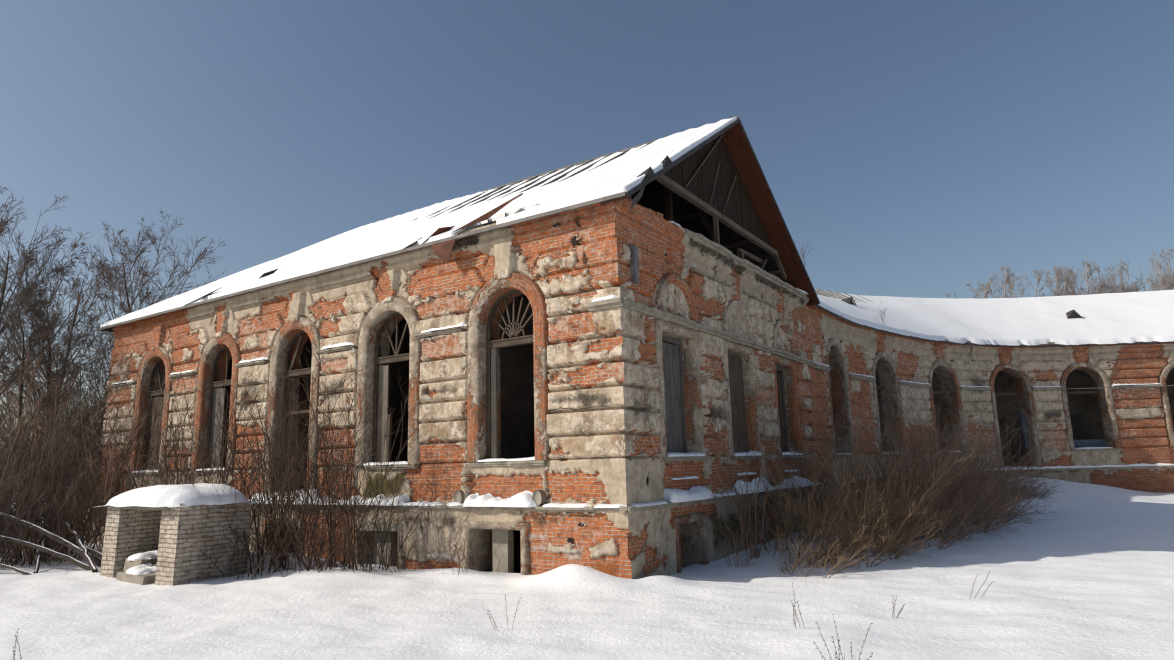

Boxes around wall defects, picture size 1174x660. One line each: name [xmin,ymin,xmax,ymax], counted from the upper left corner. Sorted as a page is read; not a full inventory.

flaking render [107,309,202,412]
flaking render [307,295,349,339]
flaking render [367,250,495,318]
flaking render [507,199,742,388]
flaking render [628,289,833,527]
flaking render [845,344,876,456]
flaking render [875,333,920,389]
flaking render [1091,345,1174,493]
flaking render [401,437,668,579]